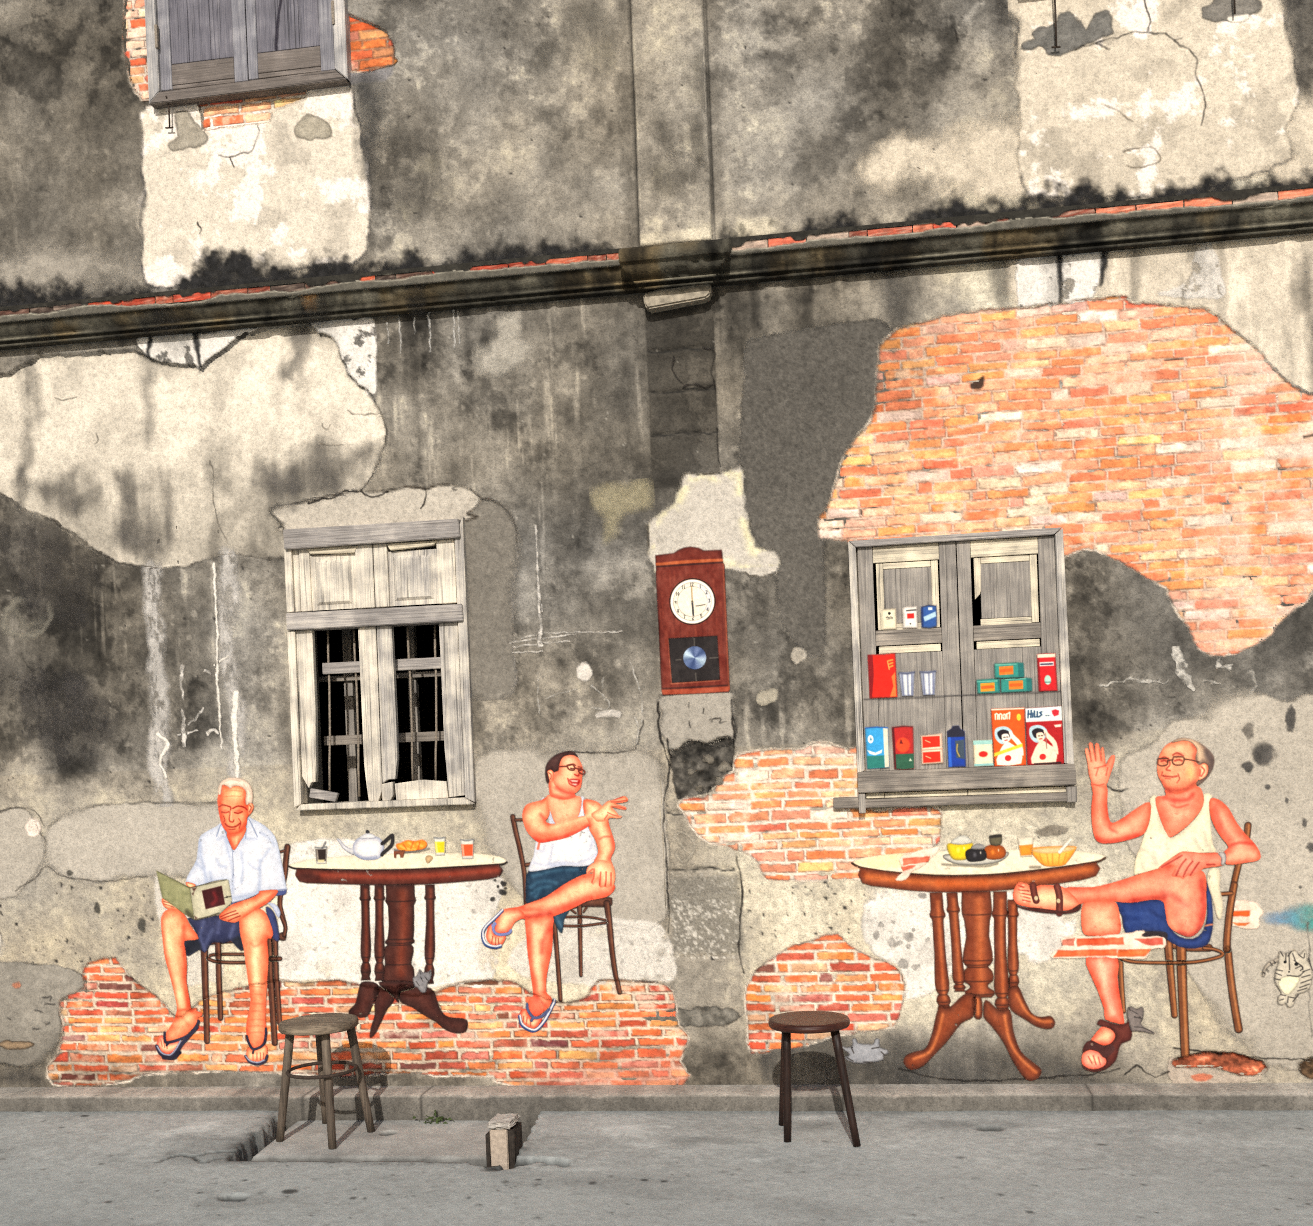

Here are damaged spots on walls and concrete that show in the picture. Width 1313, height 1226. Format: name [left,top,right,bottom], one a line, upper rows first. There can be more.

peeling [123,0,397,288]
crack [1075,0,1206,118]
peeling [1008,0,1299,198]
leakage [0,245,151,307]
leakage [177,249,424,290]
leakage [442,238,612,265]
spalling [0,325,387,569]
flaking render [818,295,1313,656]
efflorescence [212,548,245,778]
flaking render [669,719,942,882]
flaking render [47,934,905,1086]